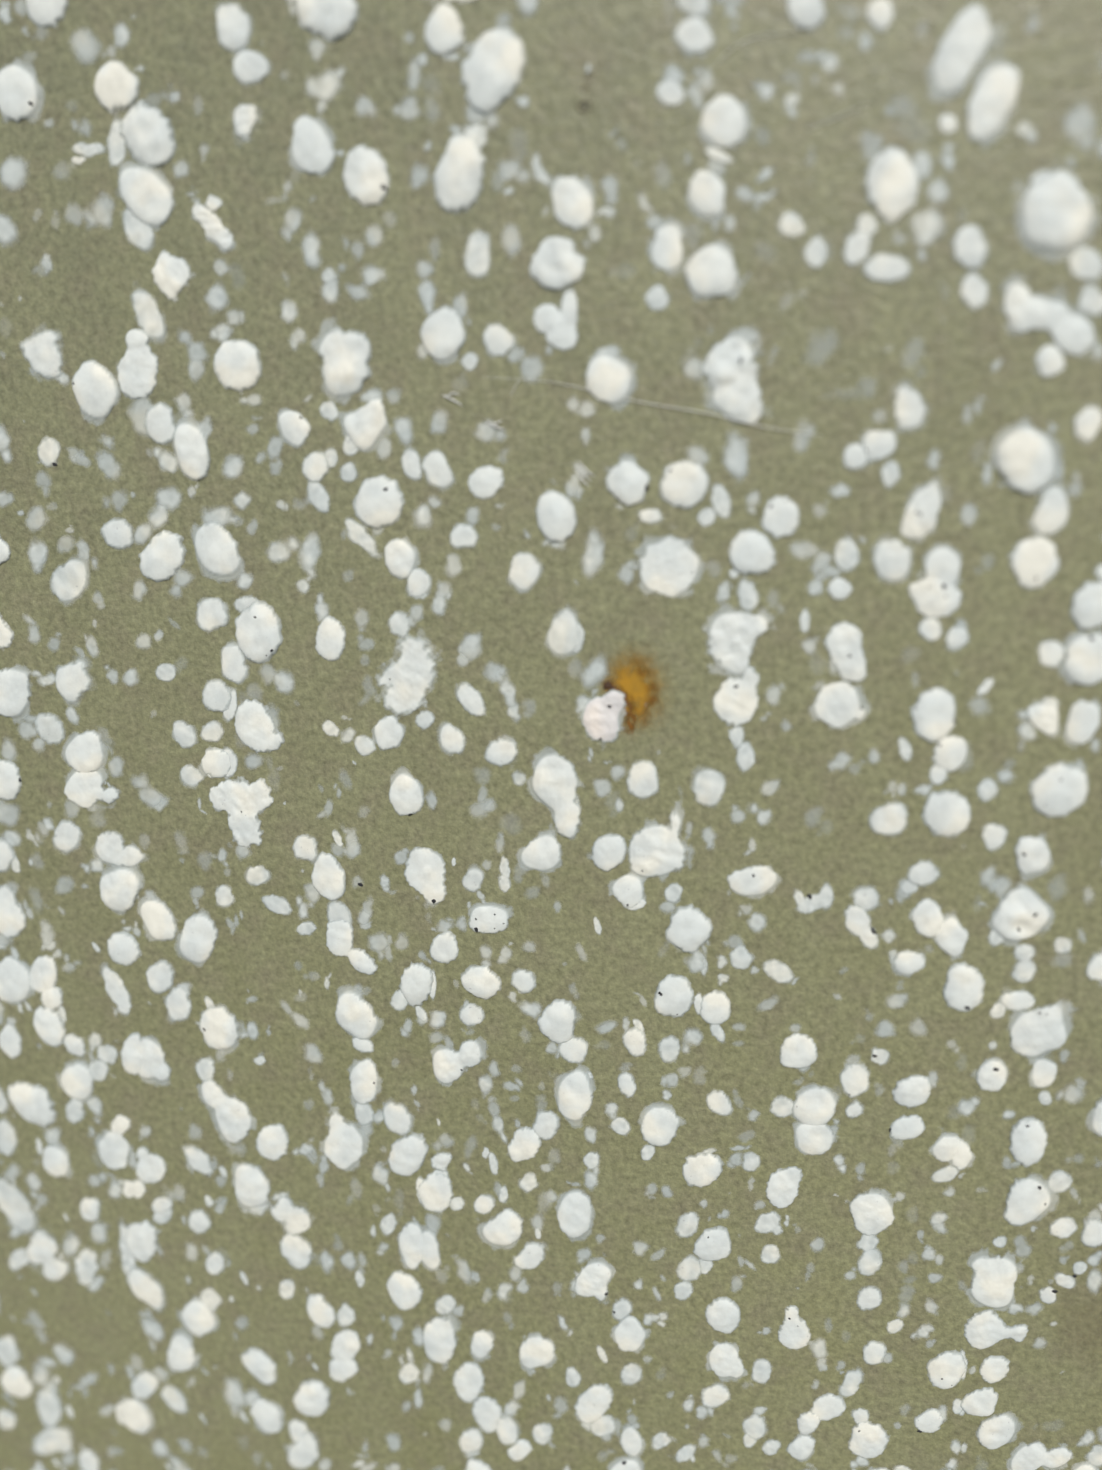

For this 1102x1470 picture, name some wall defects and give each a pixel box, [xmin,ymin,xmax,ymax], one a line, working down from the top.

corrosion [603,659,655,731]